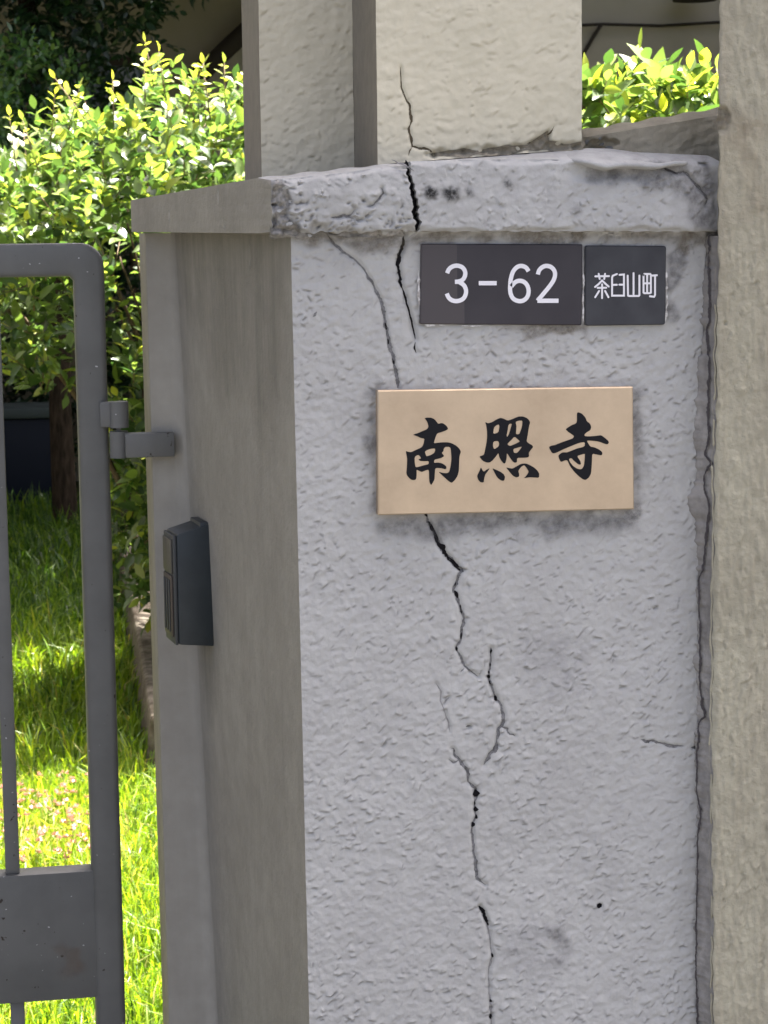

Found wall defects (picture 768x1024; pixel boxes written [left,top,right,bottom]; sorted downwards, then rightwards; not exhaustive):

crack [327,67,433,387]
crack [425,514,515,1024]
crack [641,234,713,1024]